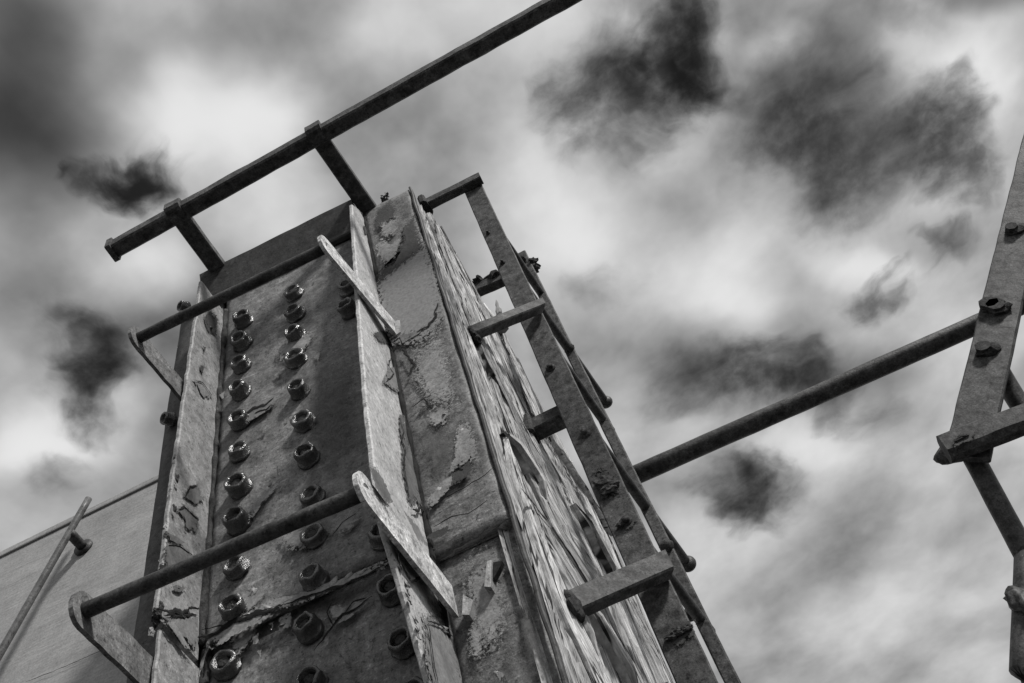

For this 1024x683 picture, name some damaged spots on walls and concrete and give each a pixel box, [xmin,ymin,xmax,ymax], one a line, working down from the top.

peeling [368,199,480,552]
peeling [158,473,204,570]
peeling [245,583,268,611]
peeling [228,610,293,658]
peeling [329,604,345,618]